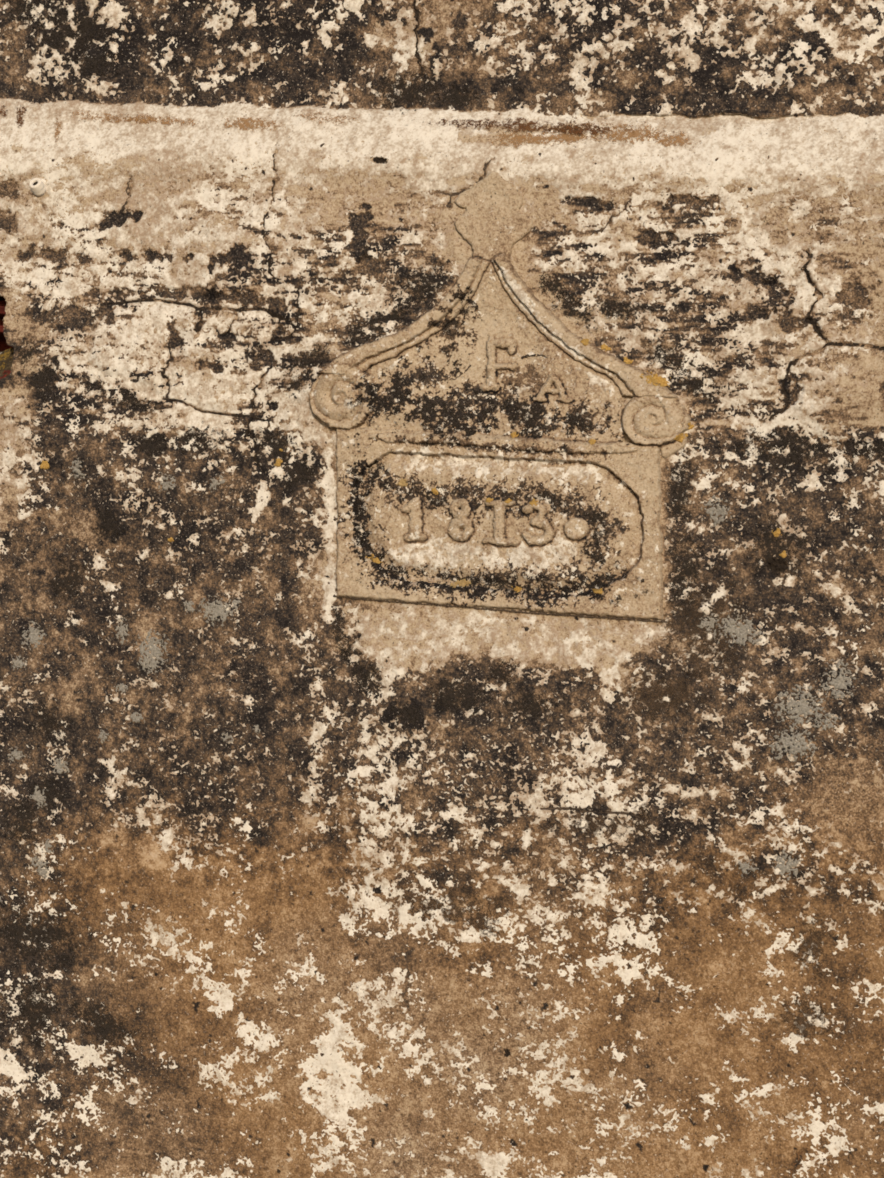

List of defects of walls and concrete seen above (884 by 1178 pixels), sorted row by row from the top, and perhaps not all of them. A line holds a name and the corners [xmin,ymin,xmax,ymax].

crack [413,0,424,75]
crack [109,153,300,341]
crack [769,251,884,421]
water stain [85,375,227,458]
crack [160,348,265,473]
water stain [251,427,315,493]
water stain [49,556,86,606]
water stain [331,604,383,697]
water stain [28,698,71,744]
water stain [385,659,569,731]
water stain [1,775,69,846]
water stain [549,803,651,837]